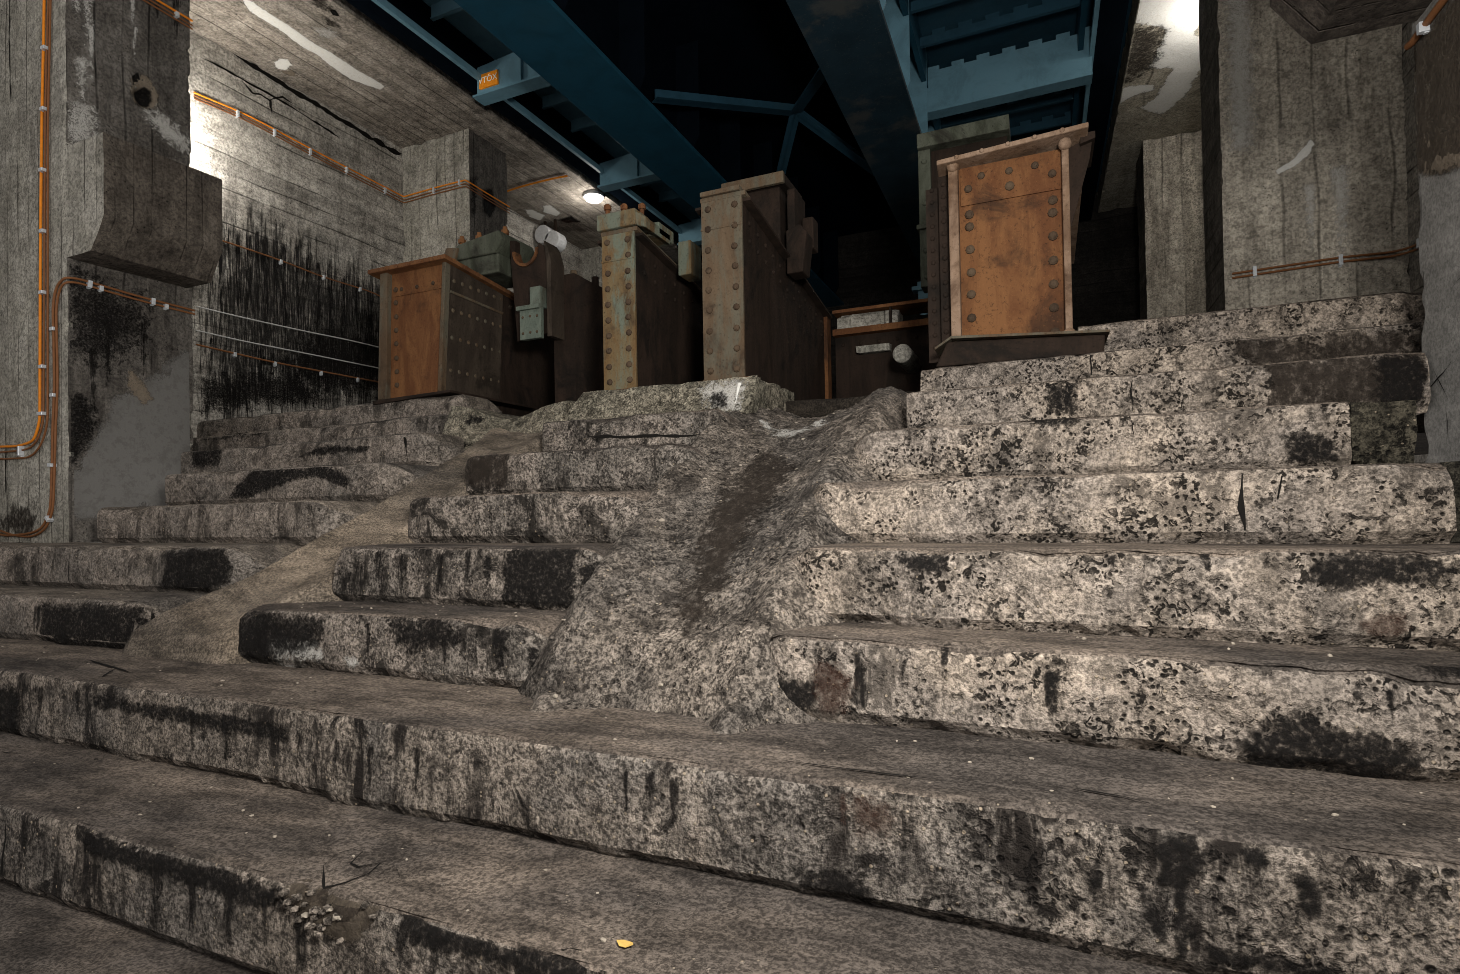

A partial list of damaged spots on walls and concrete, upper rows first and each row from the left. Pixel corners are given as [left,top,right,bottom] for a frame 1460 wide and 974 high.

spalling [1413,0,1460,176]
water stain [69,259,159,467]
water stain [191,204,380,468]
water stain [0,685,43,736]
water stain [75,689,302,768]
water stain [83,834,307,974]
crack [322,849,400,890]
water stain [396,914,606,974]